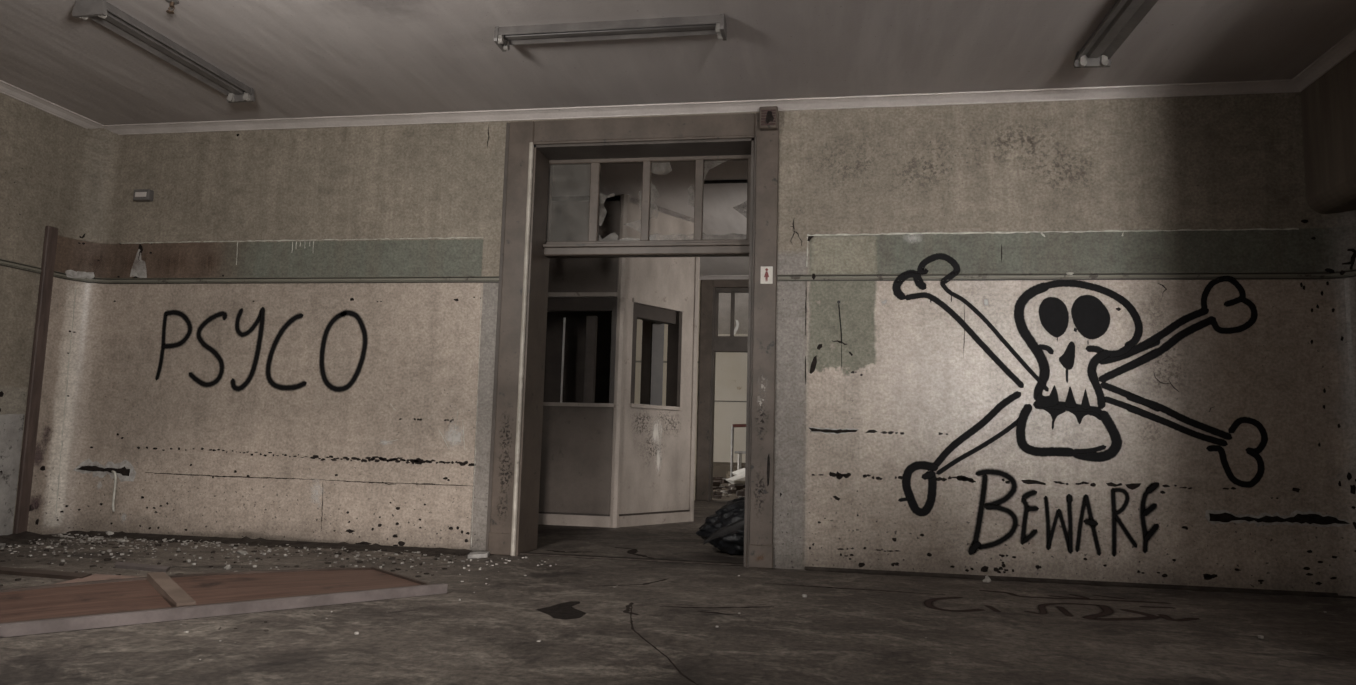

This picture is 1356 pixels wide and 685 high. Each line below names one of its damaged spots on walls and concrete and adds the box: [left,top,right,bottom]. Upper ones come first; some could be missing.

peeling [809,344,822,374]